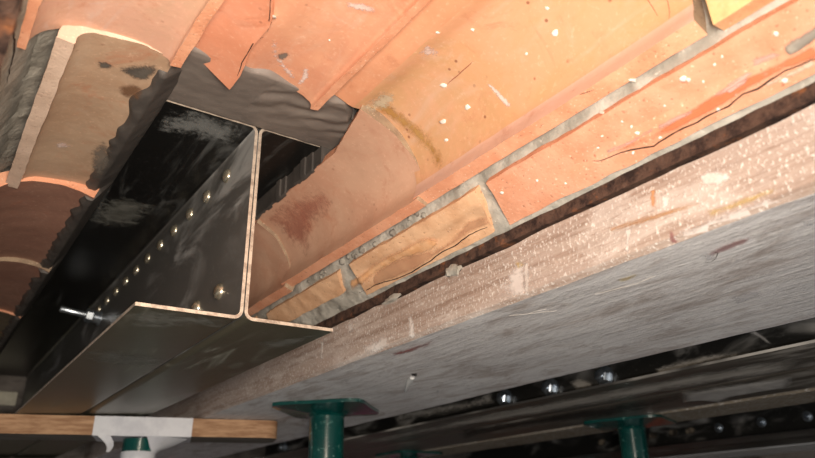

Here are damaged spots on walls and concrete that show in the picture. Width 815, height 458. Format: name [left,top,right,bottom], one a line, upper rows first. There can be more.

crack [237,0,272,76]
crack [599,59,815,161]
crack [367,224,494,290]